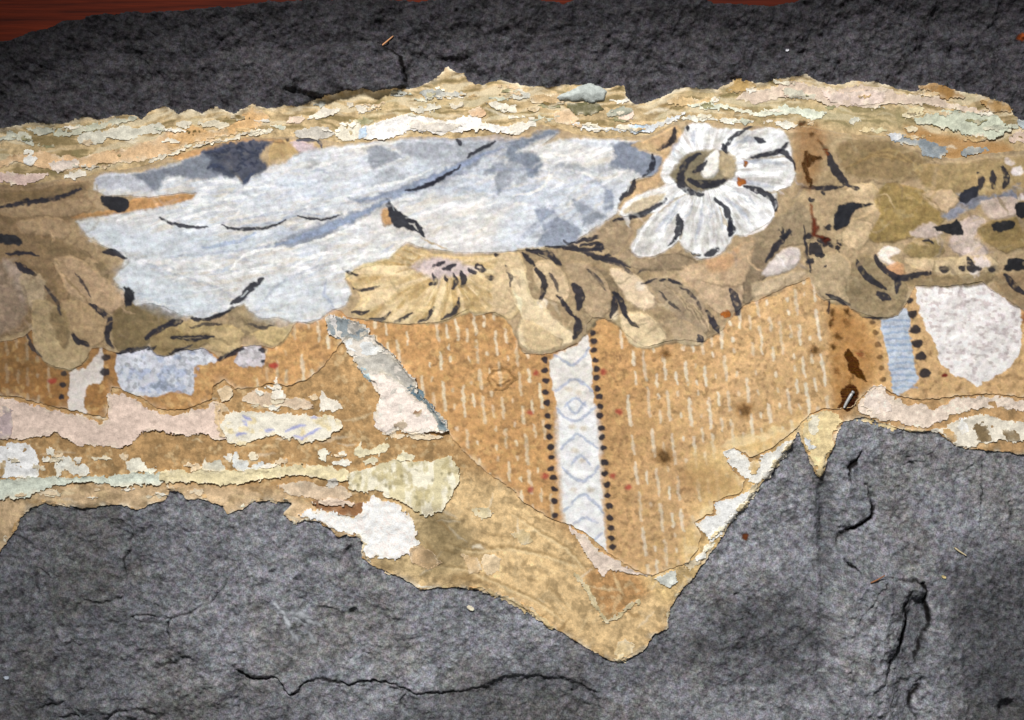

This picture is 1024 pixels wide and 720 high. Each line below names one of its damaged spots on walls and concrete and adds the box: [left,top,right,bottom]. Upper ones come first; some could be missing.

peeling [0,78,1024,186]
peeling [0,314,460,570]
crack [835,458,874,572]
crack [886,579,931,670]
crack [279,678,388,695]
crack [907,684,920,716]